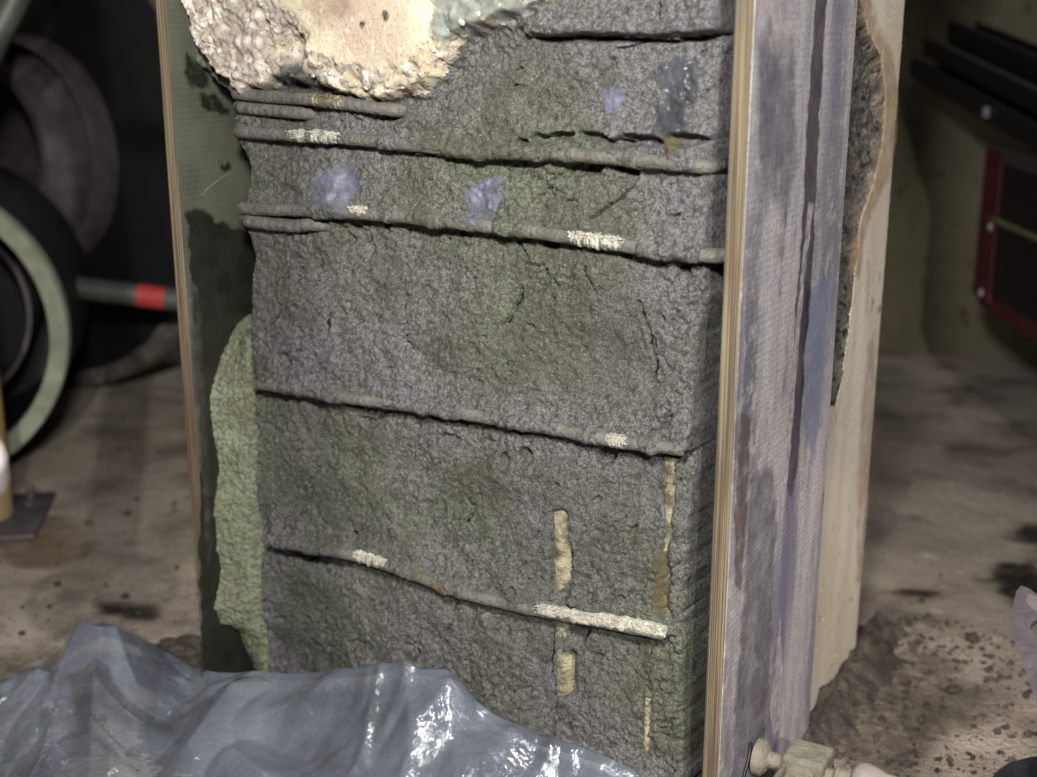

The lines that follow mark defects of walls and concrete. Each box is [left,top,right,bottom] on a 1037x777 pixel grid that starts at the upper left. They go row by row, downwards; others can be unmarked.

leakage [285,129,341,144]
spalling [830,0,885,406]
leakage [567,230,625,252]
crack [642,305,659,374]
spalling [181,0,734,777]
leakage [352,549,387,568]
leakage [533,604,669,639]